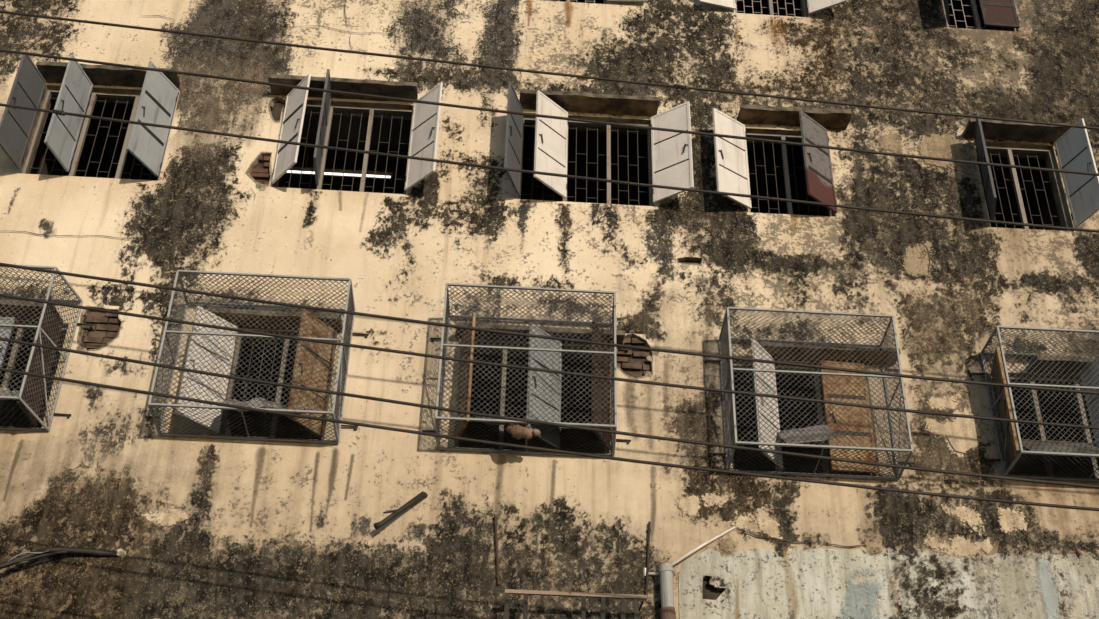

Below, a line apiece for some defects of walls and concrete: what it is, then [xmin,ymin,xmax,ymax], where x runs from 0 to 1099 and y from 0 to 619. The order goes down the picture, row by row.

water stain [0,0,87,87]
water stain [87,0,331,375]
flaking render [245,152,272,191]
water stain [39,218,56,238]
water stain [0,279,69,303]
flaking render [76,303,123,352]
water stain [359,0,1099,619]
flaking render [616,333,659,380]
water stain [0,384,831,619]
flaking render [698,573,729,609]